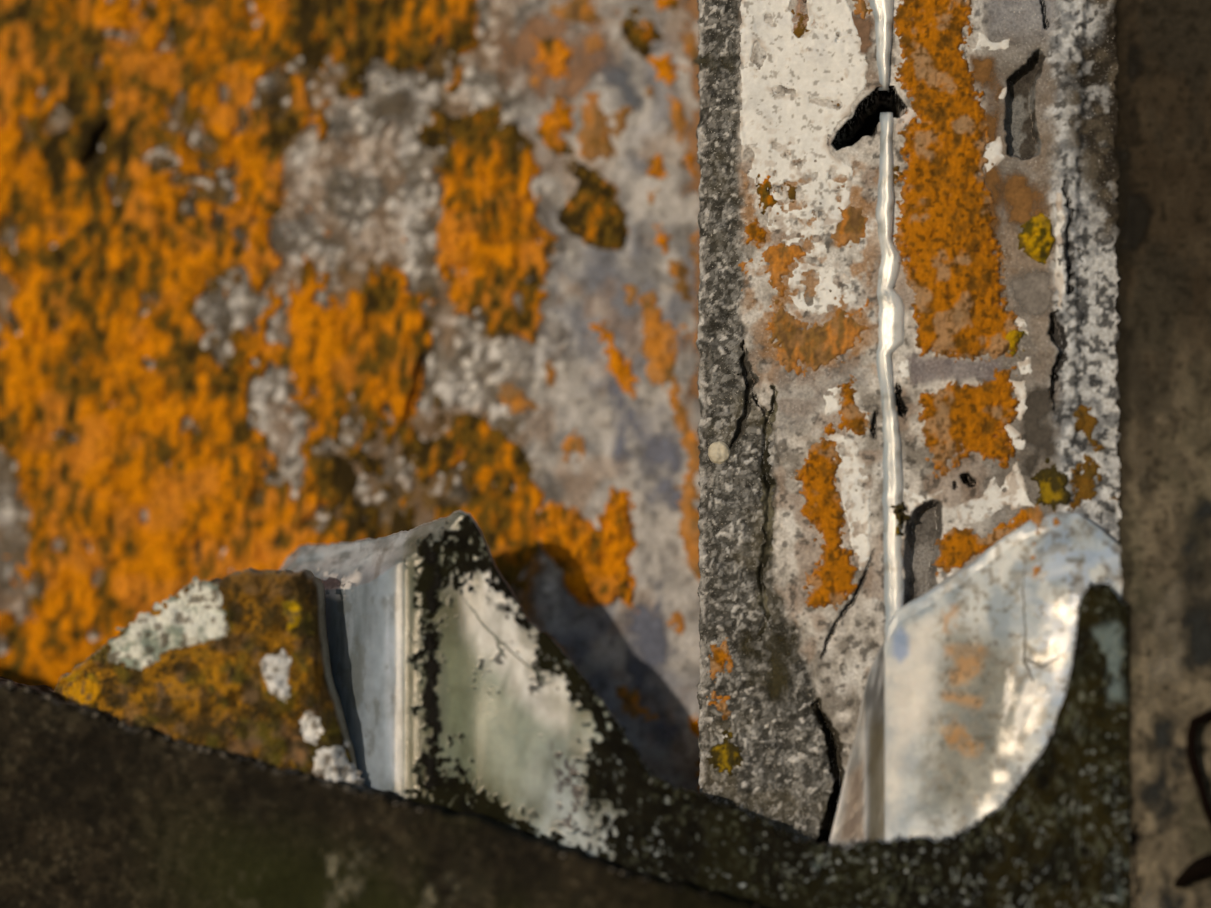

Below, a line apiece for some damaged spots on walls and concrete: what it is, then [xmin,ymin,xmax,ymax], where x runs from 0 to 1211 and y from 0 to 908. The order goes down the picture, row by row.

peeling [973,32,1010,51]
peeling [895,107,916,133]
spalling [983,48,1046,172]
crack [820,557,871,660]
crack [807,697,845,845]